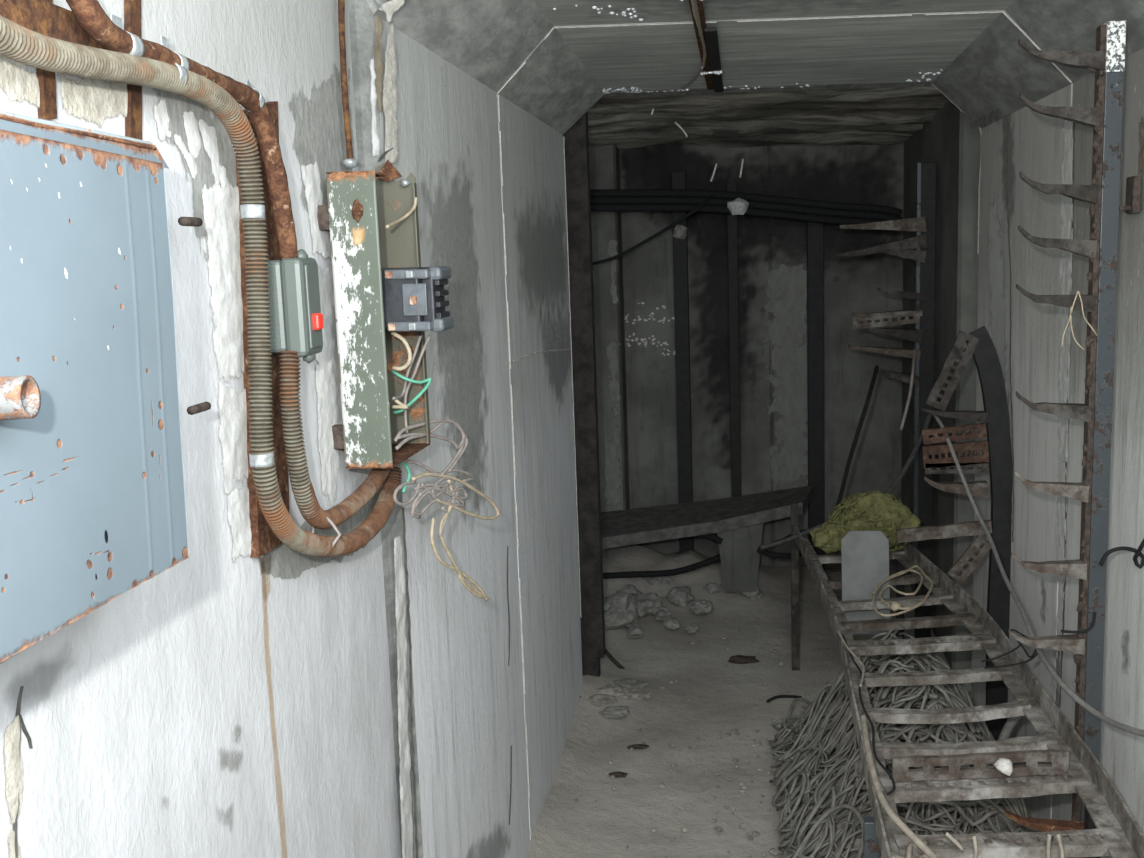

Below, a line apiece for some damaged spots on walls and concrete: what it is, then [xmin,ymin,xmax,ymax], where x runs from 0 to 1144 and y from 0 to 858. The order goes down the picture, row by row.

peeling [0,55,40,107]
peeling [58,74,128,129]
spalling [370,0,404,163]
damp [622,142,727,191]
peeling [154,65,367,579]
peeling [300,488,381,536]